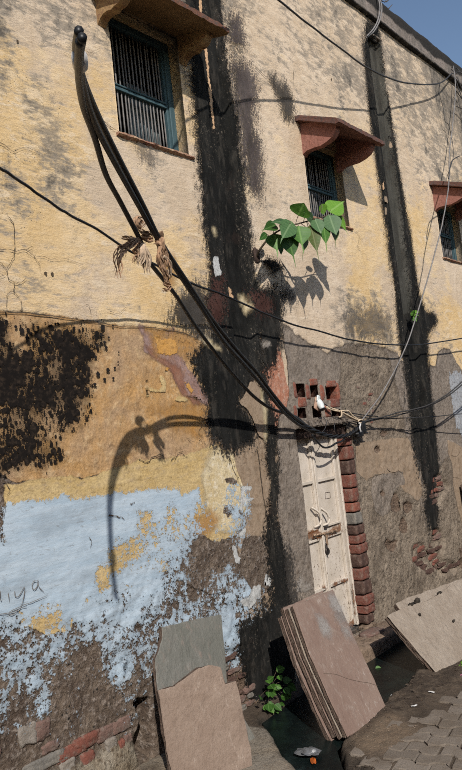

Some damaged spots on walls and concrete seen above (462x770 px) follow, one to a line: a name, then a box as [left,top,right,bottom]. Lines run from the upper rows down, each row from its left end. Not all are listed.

leakage [0,309,119,478]
peeling [0,311,462,770]
leakage [156,0,312,703]
leakage [340,14,442,540]